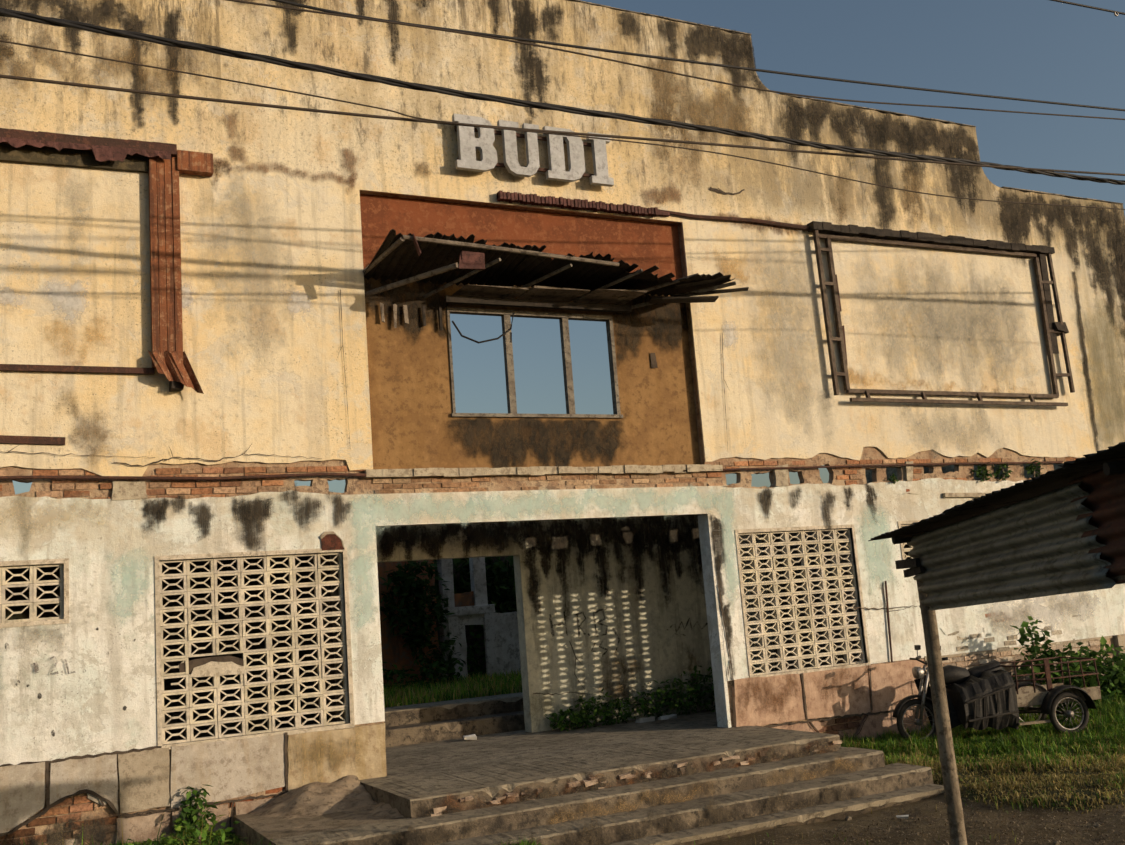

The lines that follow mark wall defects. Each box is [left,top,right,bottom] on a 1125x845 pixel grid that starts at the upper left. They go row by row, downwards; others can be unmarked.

damp [488,0,562,124]
damp [780,97,980,229]
damp [998,192,1125,451]
damp [448,418,622,468]
flaking render [33,466,491,501]
flaking render [835,458,1012,494]
damp [234,486,351,550]
flaking render [510,460,805,597]
damp [377,515,735,687]
flaking render [0,793,118,845]
spalling [431,796,474,816]
spalling [489,776,605,805]